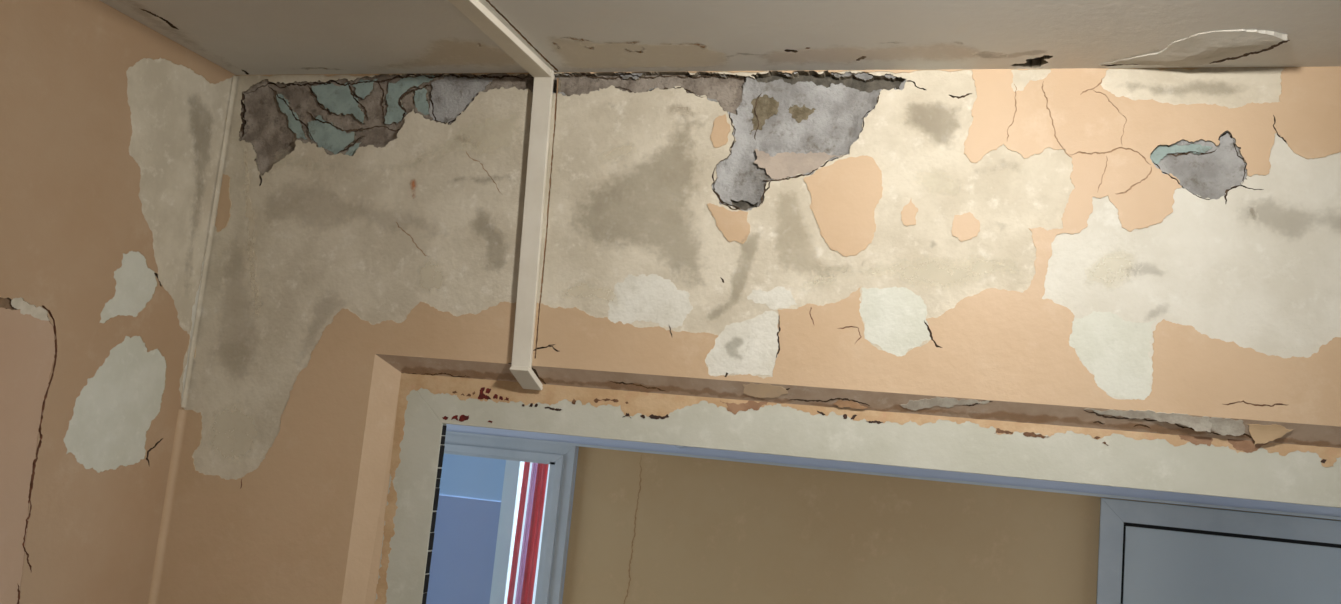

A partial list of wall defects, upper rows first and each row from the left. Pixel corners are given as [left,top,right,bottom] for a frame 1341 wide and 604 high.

crack [908,80,972,99]
crack [1007,64,1152,194]
peeling [63,58,534,480]
peeling [537,67,1341,445]
crack [0,297,57,604]
peeling [452,387,576,411]
peeling [1320,456,1337,467]